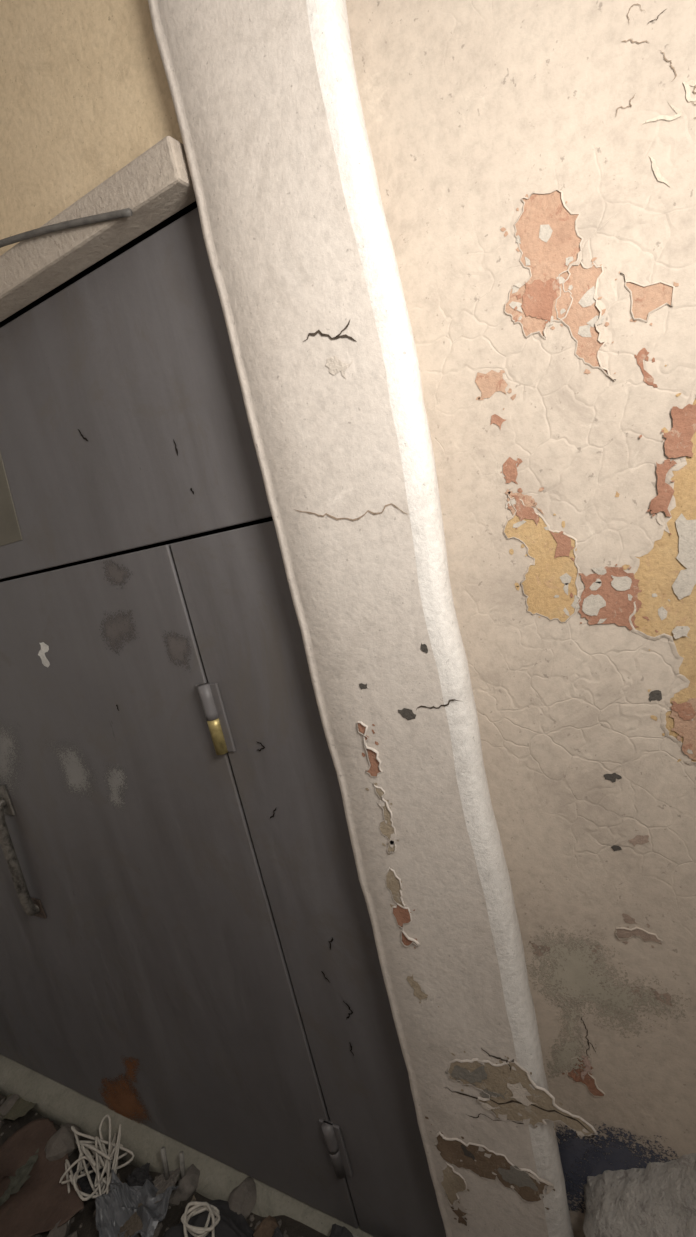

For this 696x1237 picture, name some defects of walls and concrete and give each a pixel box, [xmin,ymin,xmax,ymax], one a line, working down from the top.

peeling [501,189,679,381]
peeling [475,370,516,429]
peeling [635,348,667,388]
peeling [501,390,696,766]
peeling [357,721,420,949]
peeling [406,975,439,1007]
corrosion [98,1055,152,1125]
flaking render [444,1048,605,1148]
flaking render [425,1116,555,1231]
leakage [556,1123,678,1213]